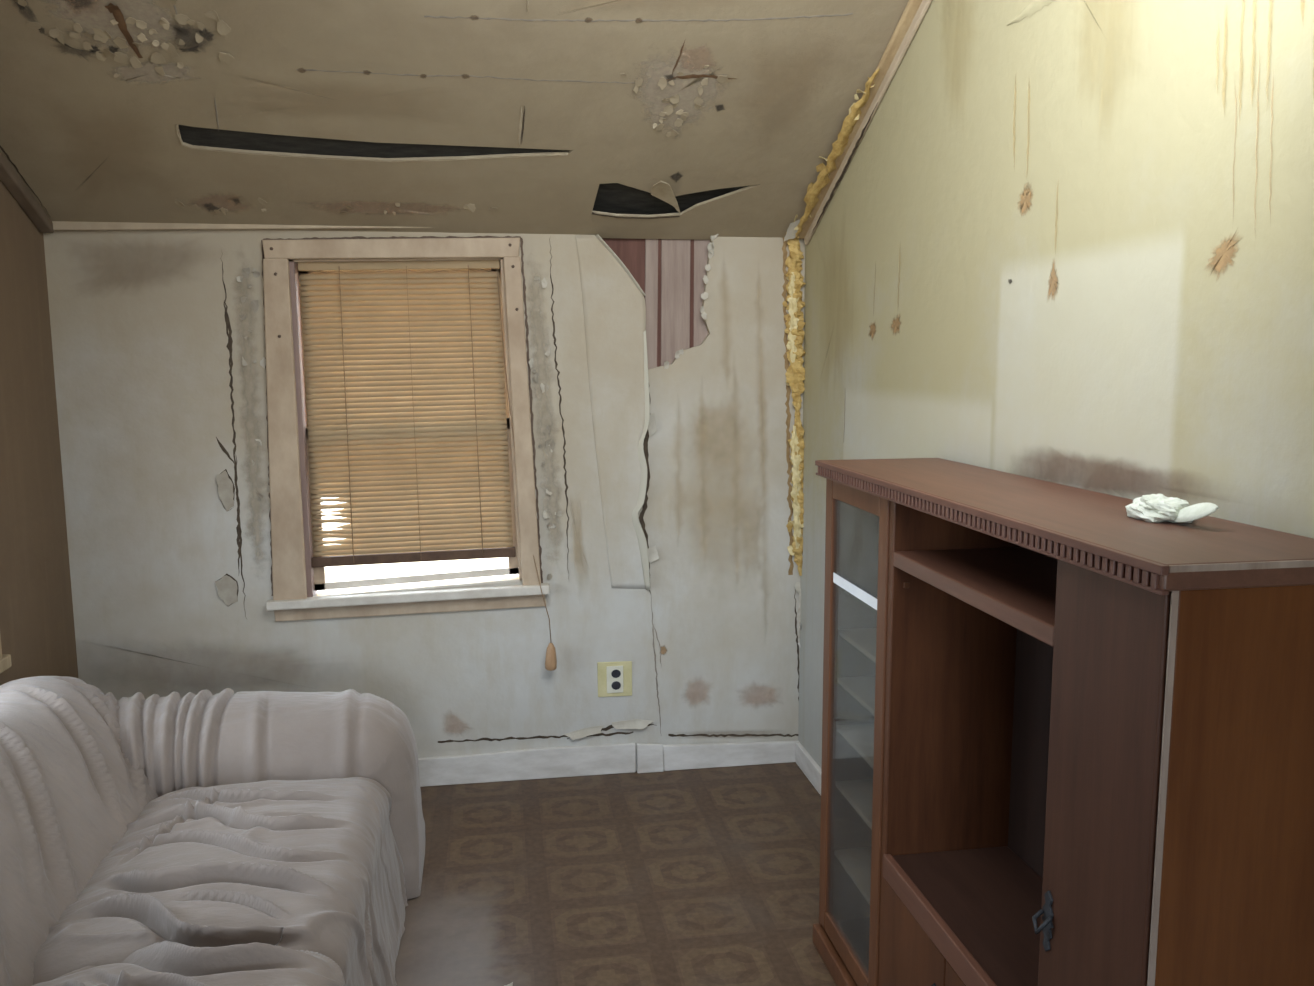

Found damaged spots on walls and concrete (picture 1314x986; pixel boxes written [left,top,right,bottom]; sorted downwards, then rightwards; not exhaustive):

peeling [14,0,234,82]
damp [1020,187,1031,213]
damp [1210,237,1237,273]
damp [1048,263,1058,296]
damp [870,317,901,338]
flaking render [529,240,569,573]